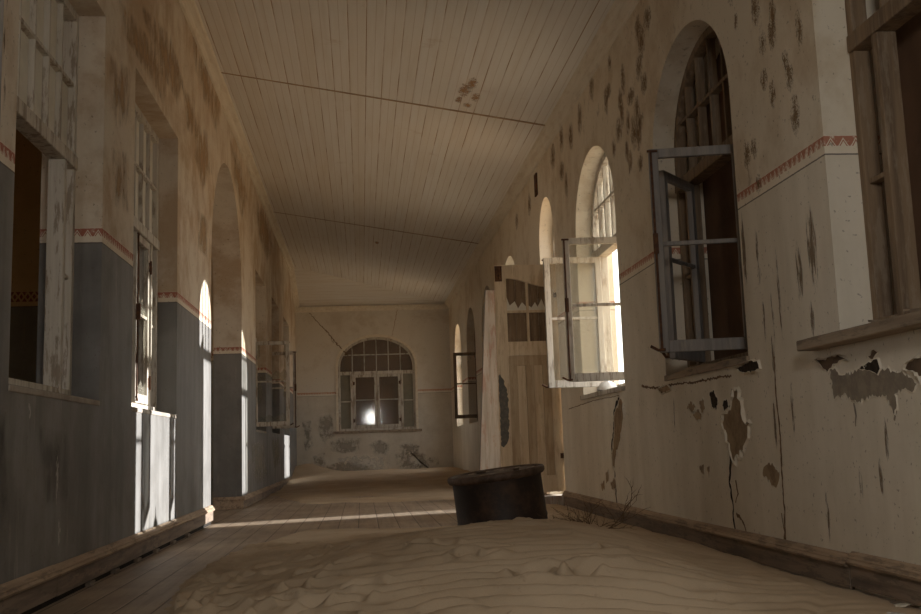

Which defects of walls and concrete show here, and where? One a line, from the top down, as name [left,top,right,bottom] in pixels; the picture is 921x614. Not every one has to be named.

damp [604,7,651,172]
peeling [814,348,921,426]
damp [303,417,387,471]
flaking render [600,397,626,502]
flaking render [642,359,762,531]
flaking render [763,461,781,489]